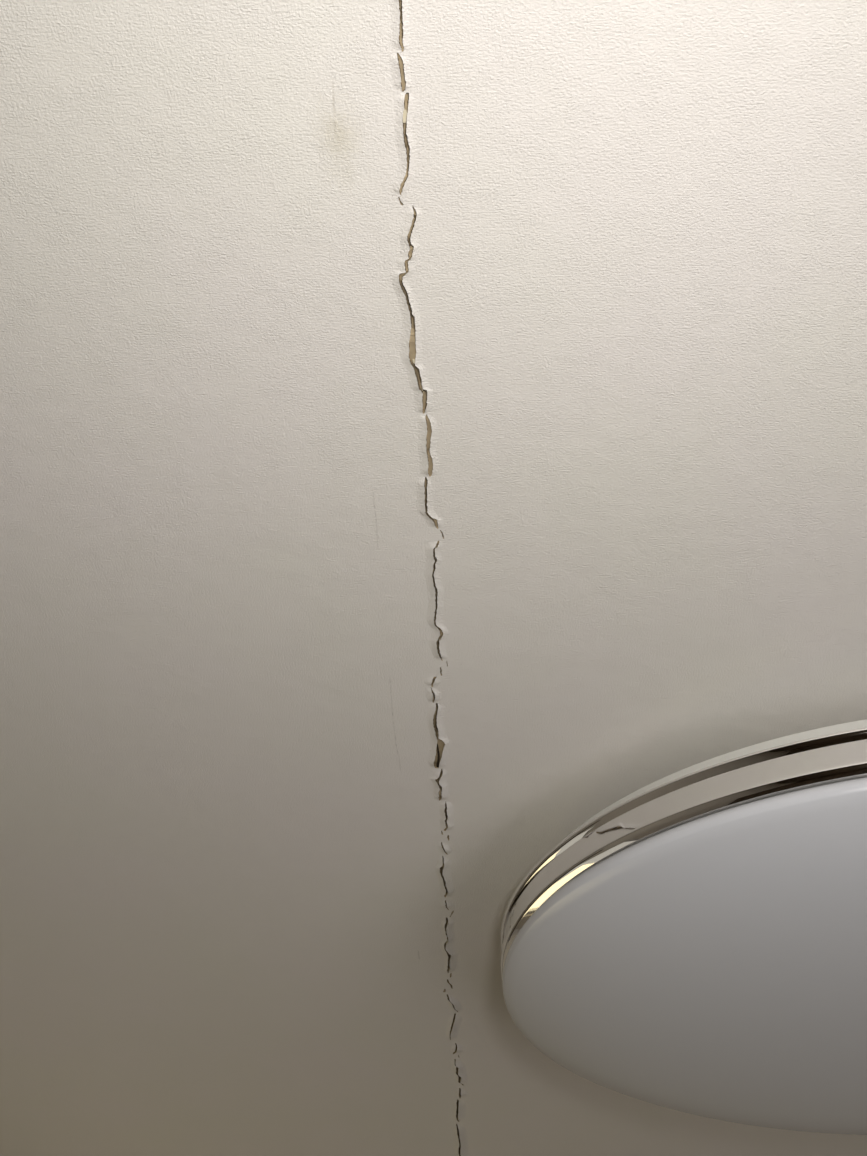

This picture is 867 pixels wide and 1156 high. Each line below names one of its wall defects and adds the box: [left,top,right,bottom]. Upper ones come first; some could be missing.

crack [389,0,470,1156]